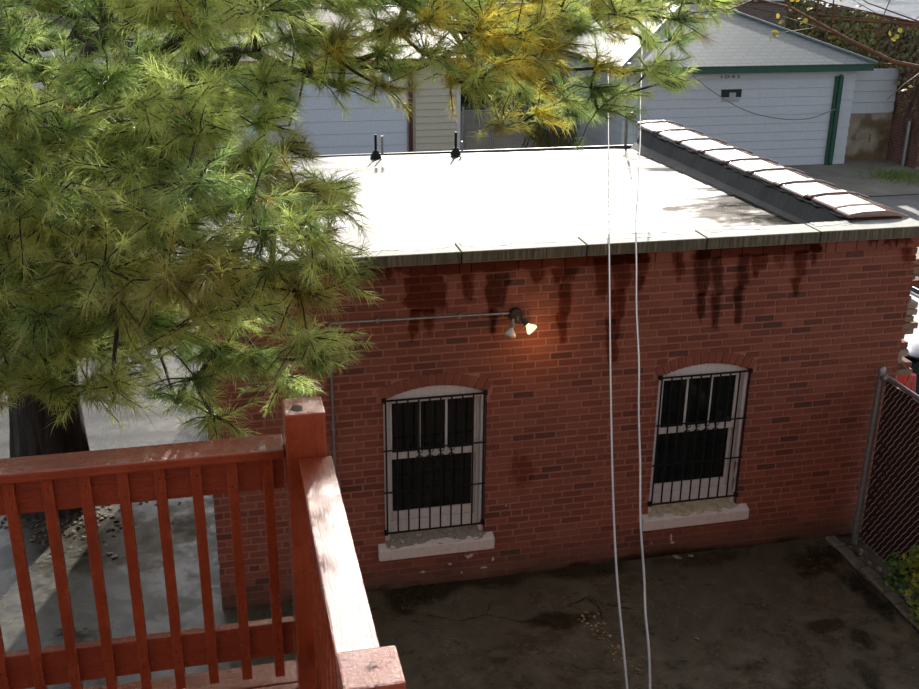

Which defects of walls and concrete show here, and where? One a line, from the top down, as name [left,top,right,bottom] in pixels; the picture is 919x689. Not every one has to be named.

spalling [894,253,919,392]